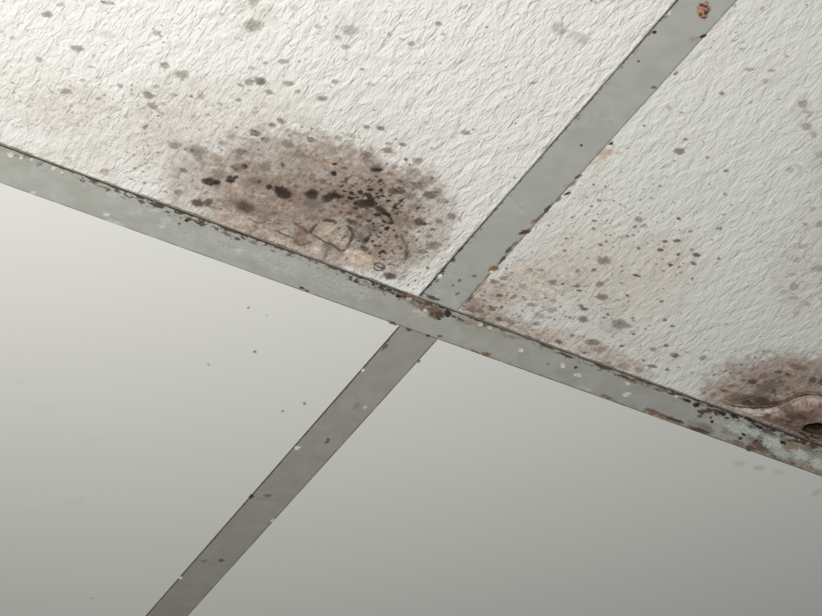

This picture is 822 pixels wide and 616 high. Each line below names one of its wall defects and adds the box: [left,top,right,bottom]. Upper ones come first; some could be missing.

corrosion [697,1,710,20]
leakage [182,133,437,279]
corrosion [488,175,581,271]
corrosion [378,287,472,324]
peeling [674,395,822,475]
leakage [701,357,822,444]